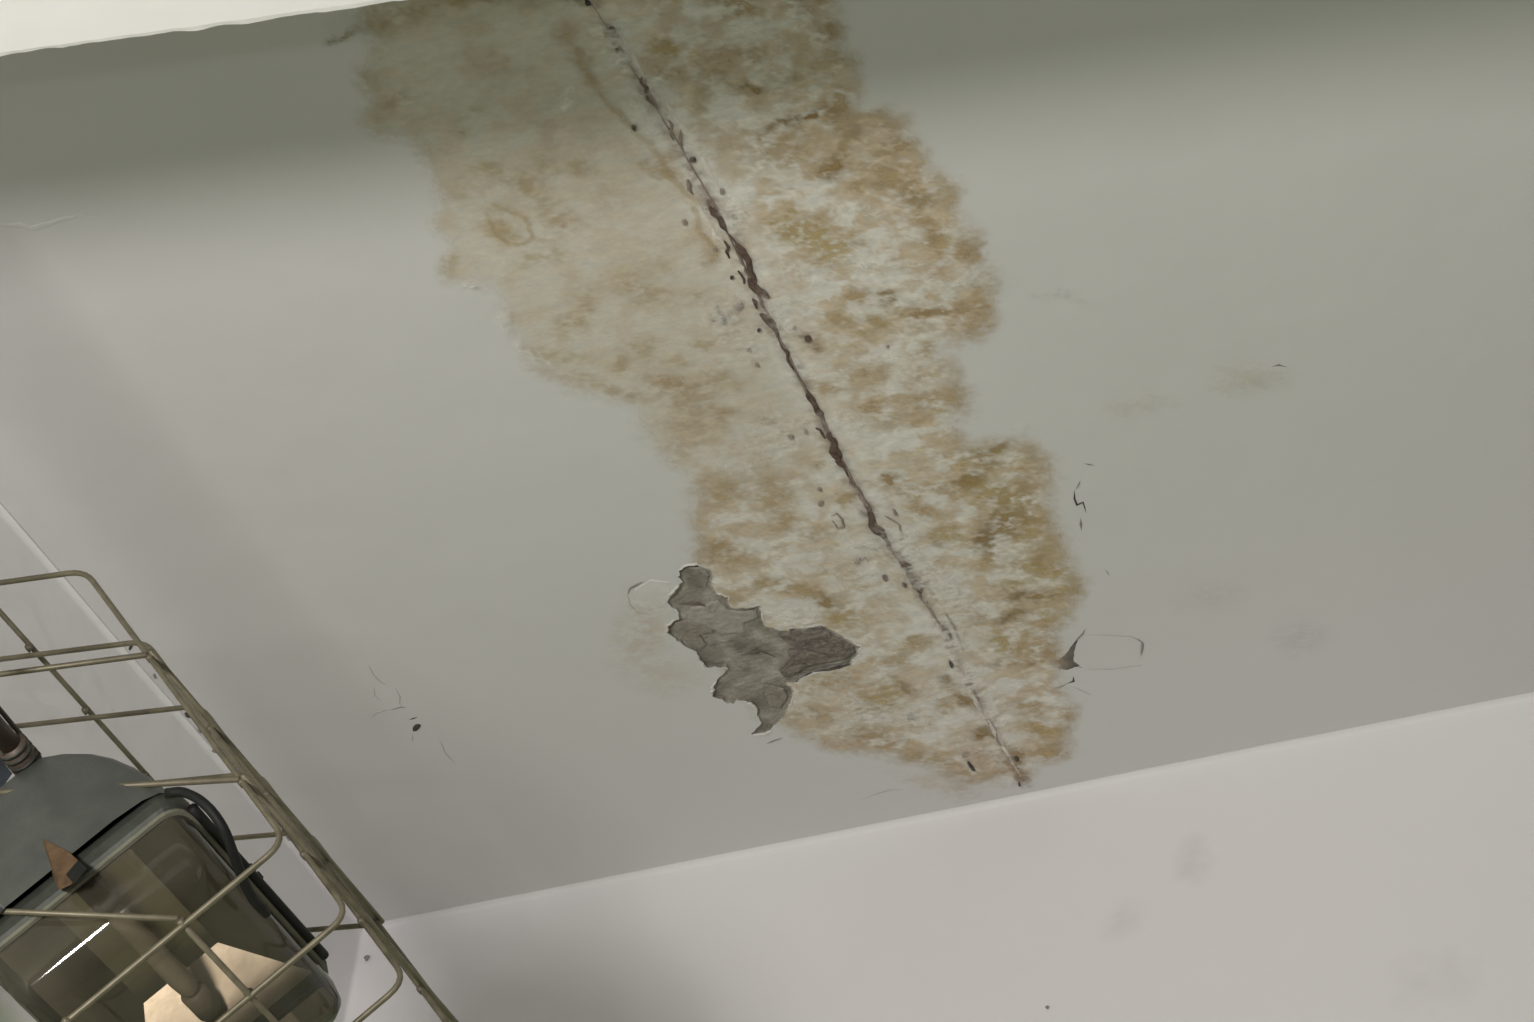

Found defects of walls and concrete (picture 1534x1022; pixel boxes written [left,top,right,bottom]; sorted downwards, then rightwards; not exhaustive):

damp [367,0,1076,783]
spalling [627,563,862,736]
crack [585,0,1024,787]
crack [1073,463,1092,531]